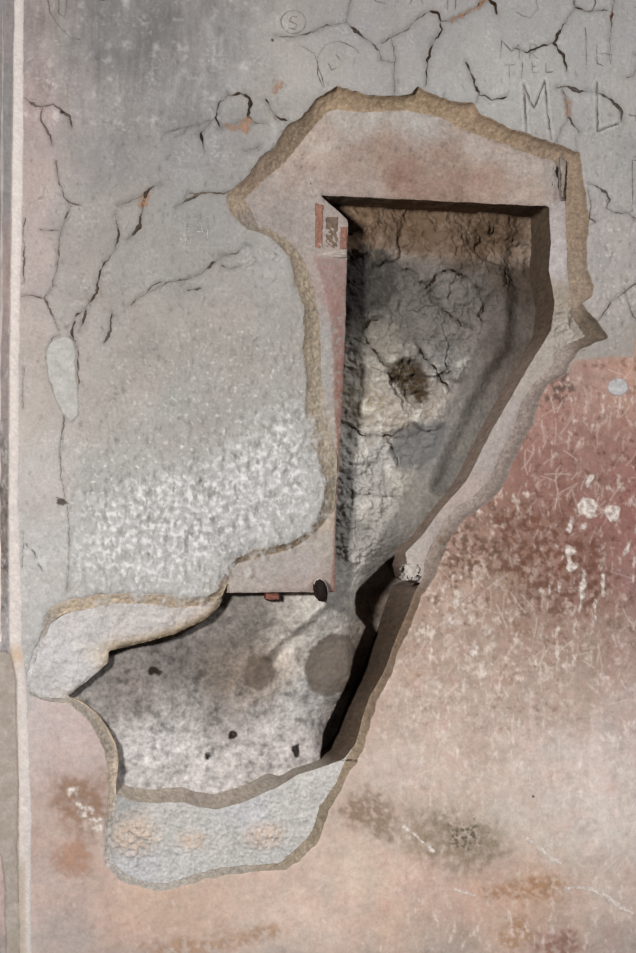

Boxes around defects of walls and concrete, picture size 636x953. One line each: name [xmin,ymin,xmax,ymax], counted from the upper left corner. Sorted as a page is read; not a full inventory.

crack [276,0,497,92]
crack [466,62,507,102]
crack [514,1,623,138]
crack [167,92,287,152]
crack [588,184,636,223]
crack [421,269,495,327]
crack [21,97,251,589]
crack [362,318,390,368]
crack [415,340,450,391]
flaking render [39,86,608,891]
water stain [350,798,391,833]
water stain [448,825,480,850]